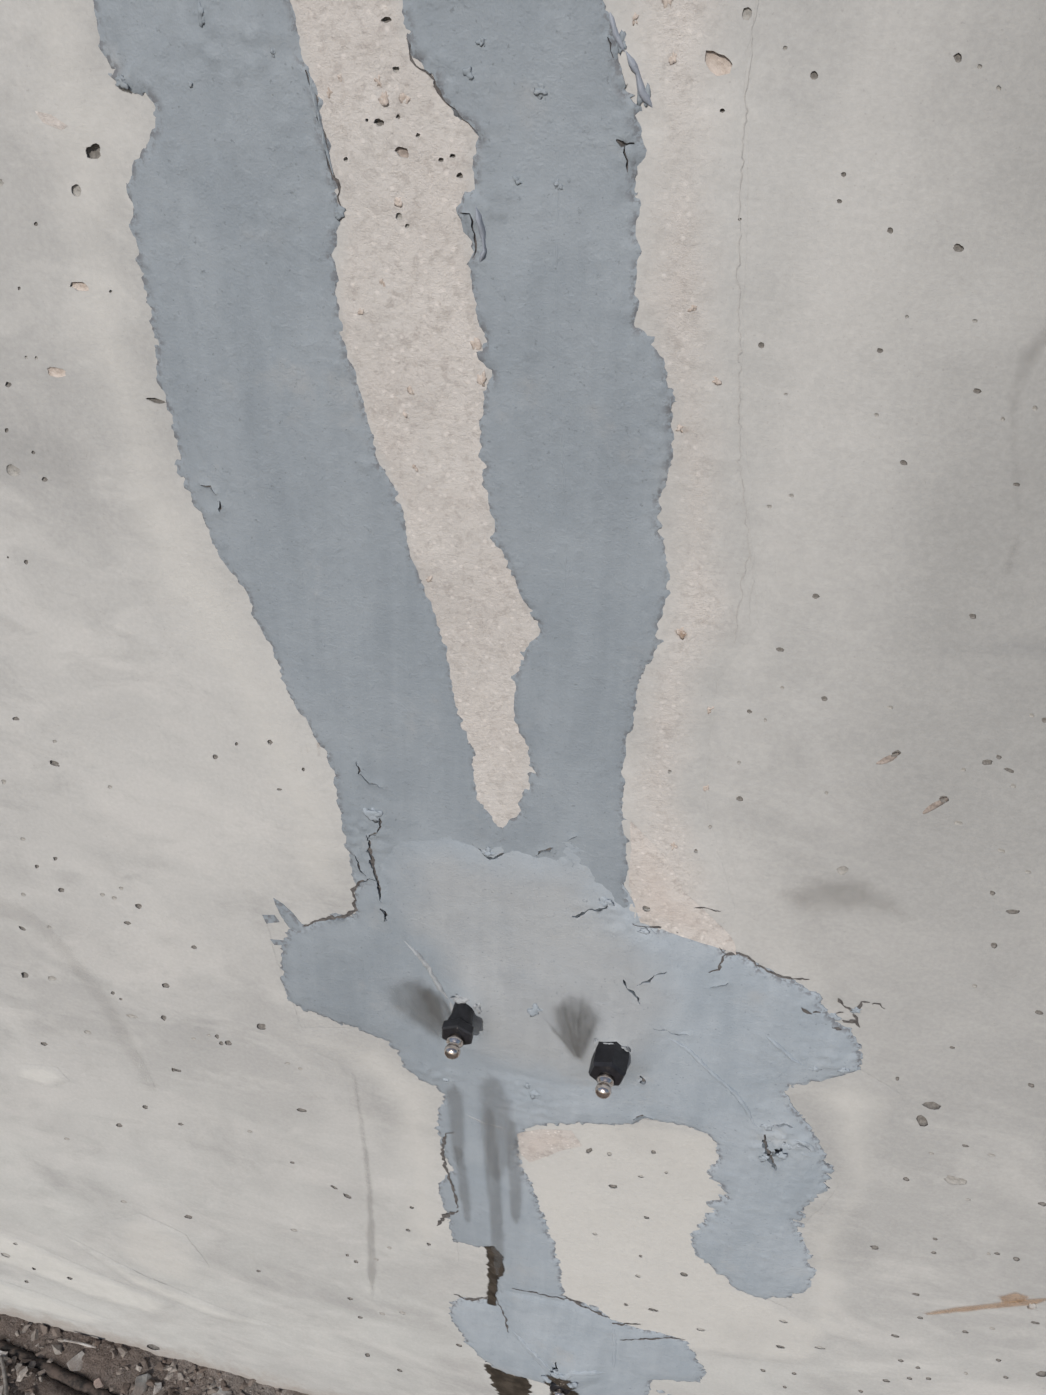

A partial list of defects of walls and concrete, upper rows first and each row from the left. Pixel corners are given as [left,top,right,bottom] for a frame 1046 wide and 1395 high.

crack [734,0,759,641]
spalling [290,0,540,828]
spalling [603,0,759,930]
spalling [3,0,459,1262]
crack [303,818,387,927]
crack [633,907,721,933]
crack [708,947,884,1030]
water stain [484,1246,505,1306]
water stain [484,1364,578,1395]